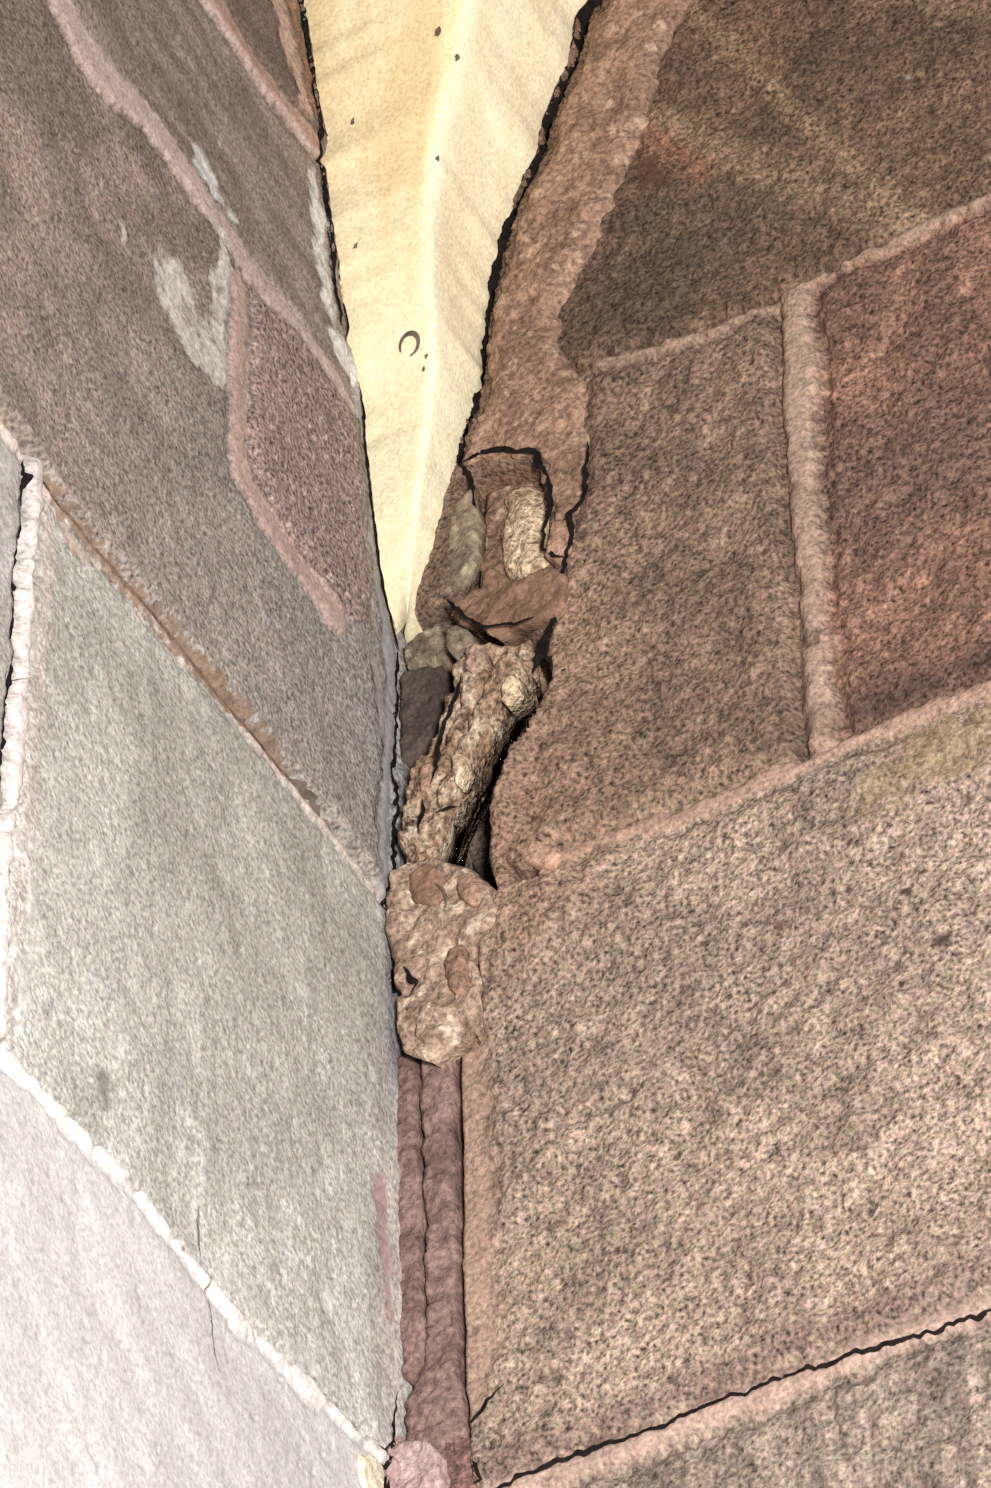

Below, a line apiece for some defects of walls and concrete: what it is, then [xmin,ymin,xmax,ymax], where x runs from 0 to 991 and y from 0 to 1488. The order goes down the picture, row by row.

leakage [153,143,238,390]
crack [298,0,350,341]
leakage [307,169,357,386]
crack [456,0,606,574]
crack [0,460,68,783]
crack [95,550,254,737]
crack [279,769,329,828]
spalling [385,481,576,1068]
crack [446,599,566,673]
crack [379,1055,991,1488]